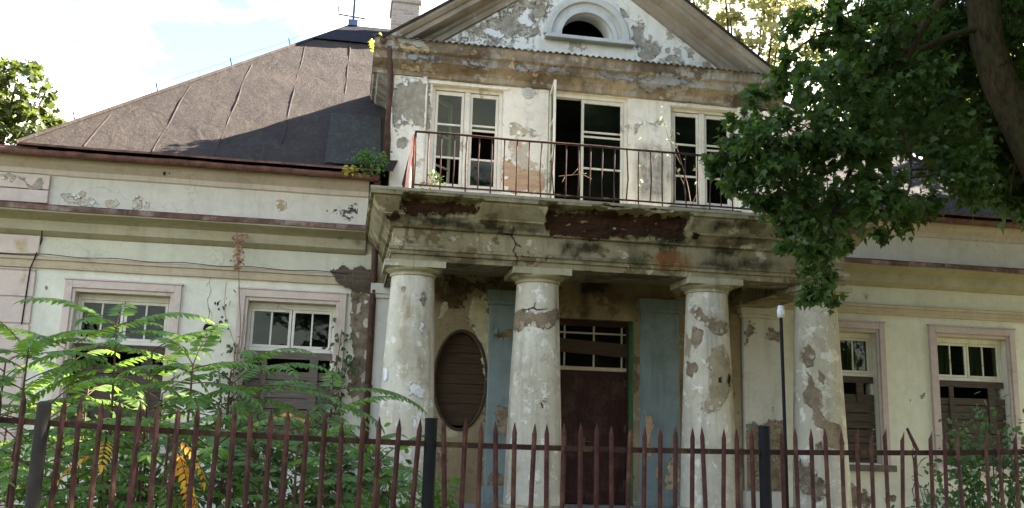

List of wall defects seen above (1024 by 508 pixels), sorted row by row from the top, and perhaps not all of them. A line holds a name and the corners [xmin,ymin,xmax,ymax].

spalling [391,0,575,149]
peeling [599,5,712,94]
flaking render [501,122,545,194]
peeling [60,191,119,208]
damp [425,218,503,231]
crack [501,227,522,265]
flaking render [465,293,560,380]
peeling [685,305,732,414]
peeling [494,404,508,436]
peeling [799,344,845,450]
spalling [798,457,826,502]